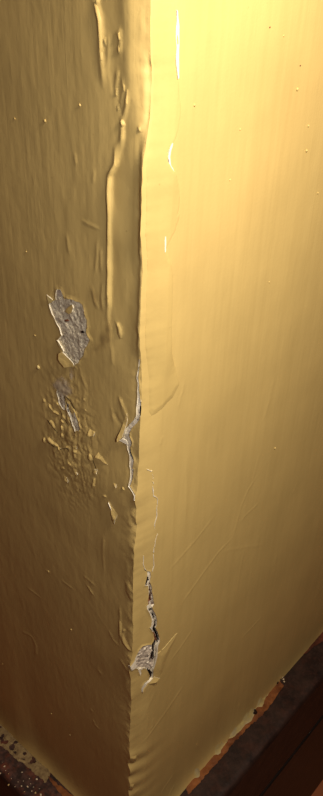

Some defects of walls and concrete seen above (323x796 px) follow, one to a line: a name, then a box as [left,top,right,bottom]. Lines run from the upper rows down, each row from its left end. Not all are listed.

peeling [42,285,95,483]
peeling [87,452,108,488]
crack [117,356,160,644]